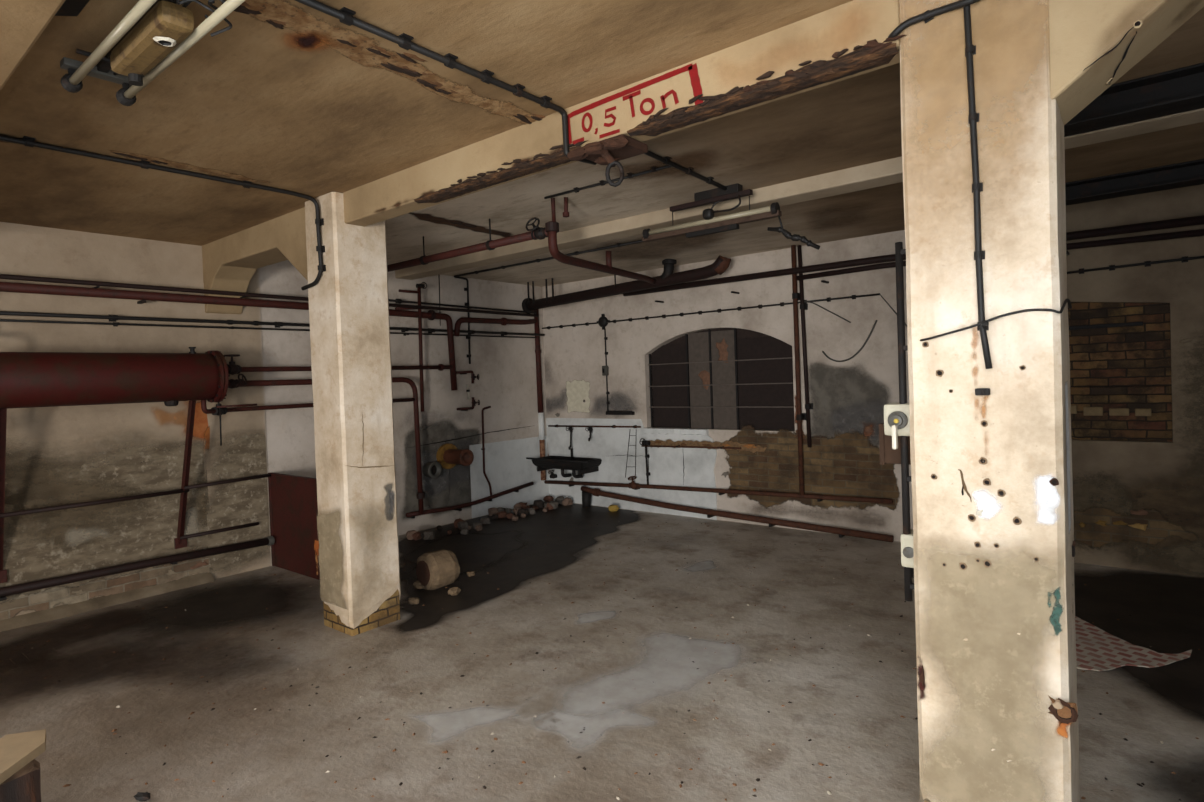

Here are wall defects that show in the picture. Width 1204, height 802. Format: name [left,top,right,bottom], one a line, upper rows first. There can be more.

spalling [221,0,546,125]
spalling [627,35,906,137]
spalling [376,140,588,212]
rust [155,401,210,450]
peeling [648,396,900,510]
damp [0,432,346,700]